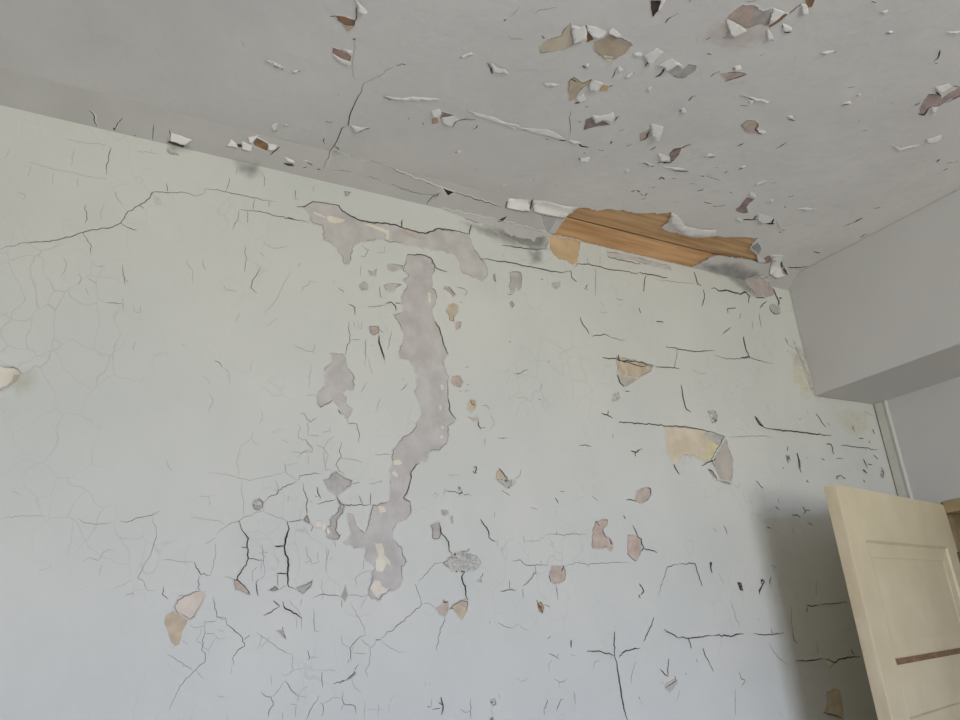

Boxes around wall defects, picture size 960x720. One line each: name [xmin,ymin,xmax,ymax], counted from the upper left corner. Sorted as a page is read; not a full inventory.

spalling [650,0,665,17]
peeling [725,3,789,38]
peeling [538,21,635,64]
peeling [914,86,960,116]
spalling [227,135,295,166]
crack [2,38,472,313]
crack [631,167,733,207]
peeling [615,357,653,387]
peeling [302,187,582,602]
peeling [664,425,734,485]
crack [83,245,884,720]
peeling [164,589,207,646]